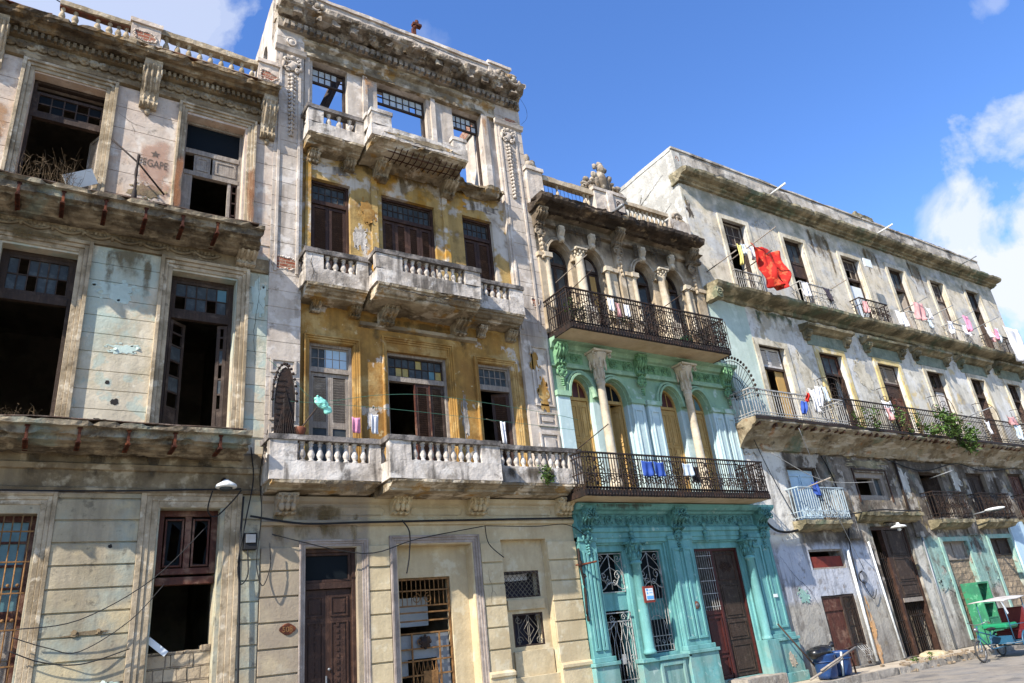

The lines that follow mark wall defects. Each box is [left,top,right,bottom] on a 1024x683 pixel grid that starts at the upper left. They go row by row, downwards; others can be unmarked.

rust [174,159,183,206]
peeling [353,196,377,253]
water stain [108,251,151,285]
flaking render [271,254,300,271]
peeling [104,342,141,354]